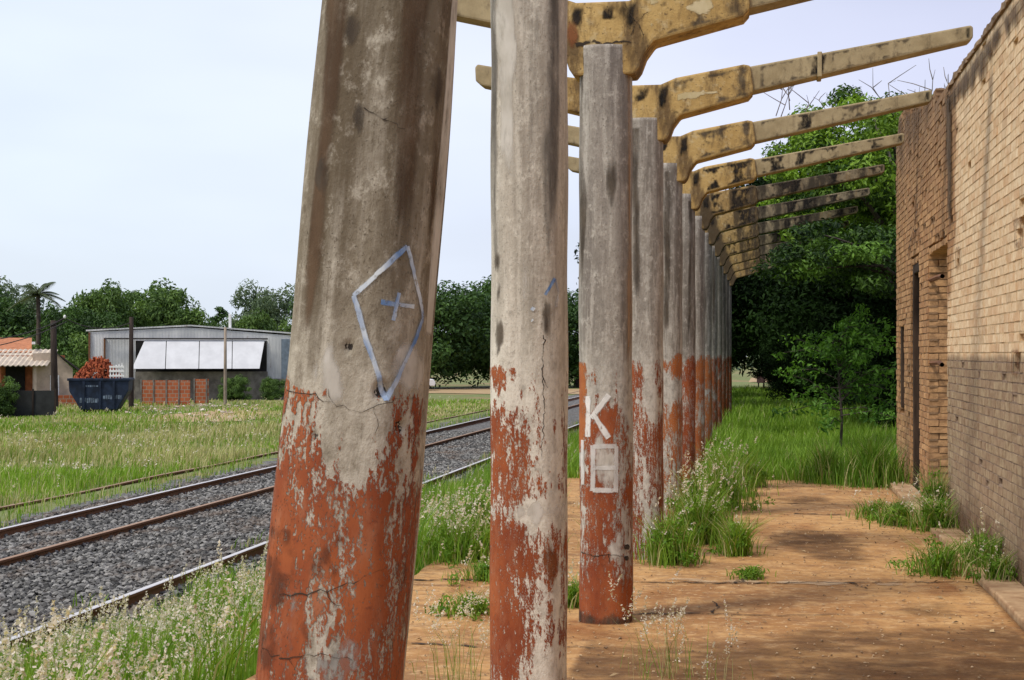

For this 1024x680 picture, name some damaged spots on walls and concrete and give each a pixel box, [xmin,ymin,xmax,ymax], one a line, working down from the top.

water stain [307,0,358,319]
water stain [399,0,427,209]
peeling [496,0,517,169]
water stain [659,87,667,107]
water stain [701,128,730,157]
water stain [694,144,868,308]
water stain [799,114,814,129]
crack [287,390,415,433]
crack [540,336,548,450]
crack [282,567,387,606]
peeling [255,345,424,680]
peeling [490,353,732,680]